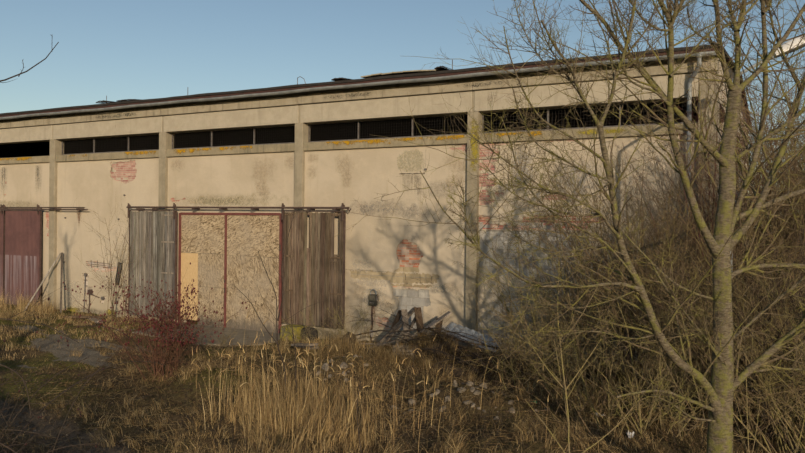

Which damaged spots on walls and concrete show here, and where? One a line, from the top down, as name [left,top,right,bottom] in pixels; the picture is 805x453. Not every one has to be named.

flaking render [110,160,137,184]
flaking render [479,142,508,205]
flaking render [350,239,445,336]
flaking render [478,215,603,295]